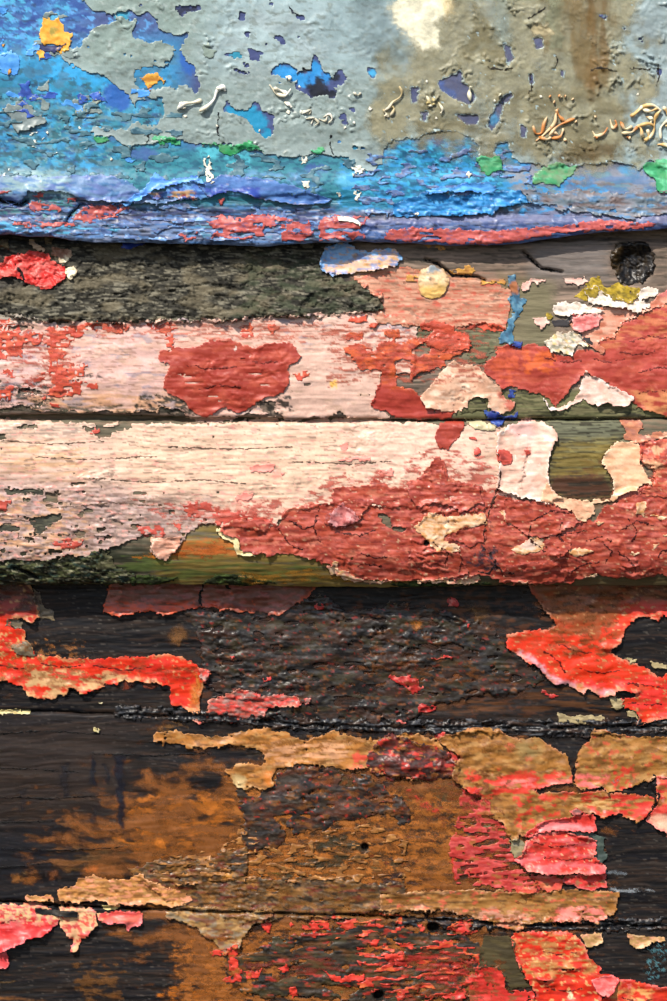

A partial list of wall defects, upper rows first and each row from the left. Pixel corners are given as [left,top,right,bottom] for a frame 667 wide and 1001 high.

peeling [0,0,417,224]
peeling [353,0,667,220]
peeling [0,207,667,1001]
crack [278,507,390,567]
crack [433,466,514,577]
crack [527,509,654,574]